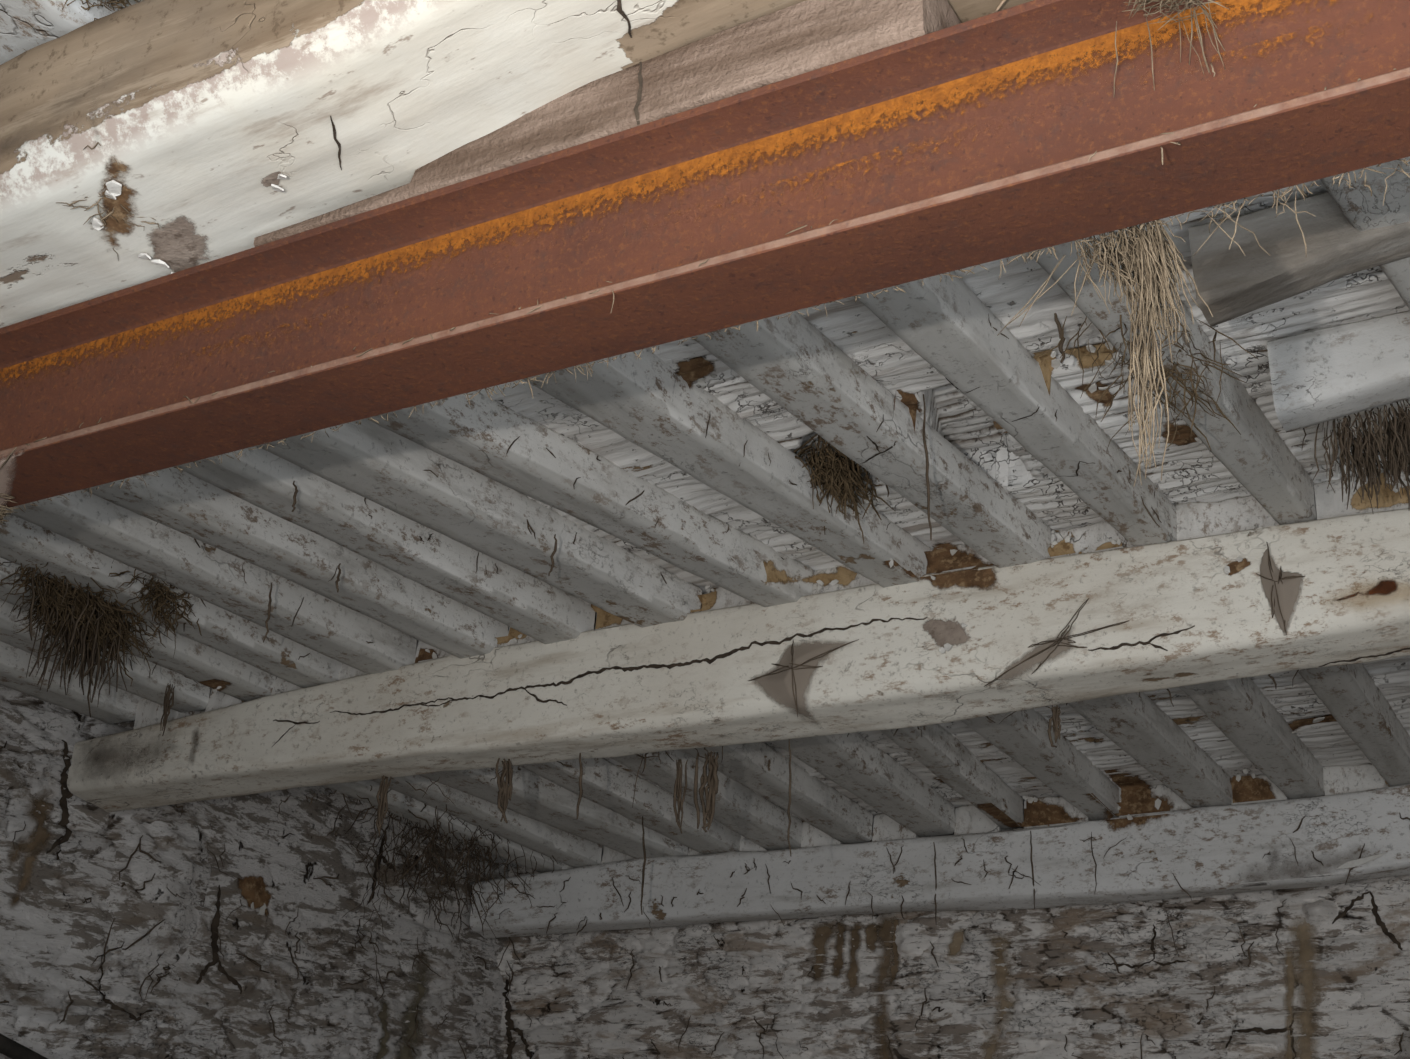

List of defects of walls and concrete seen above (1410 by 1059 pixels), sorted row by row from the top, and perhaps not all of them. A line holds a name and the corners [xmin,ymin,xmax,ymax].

crack [617,0,643,125]
spalling [92,157,208,274]
spalling [262,172,286,192]
rust [0,0,1339,390]
spalling [883,543,997,590]
crack [272,617,927,747]
crack [1089,625,1195,651]
crack [46,740,73,860]
crack [1332,891,1403,950]
crack [502,979,532,1059]
leakage [811,916,900,1059]
leakage [1285,920,1318,1059]